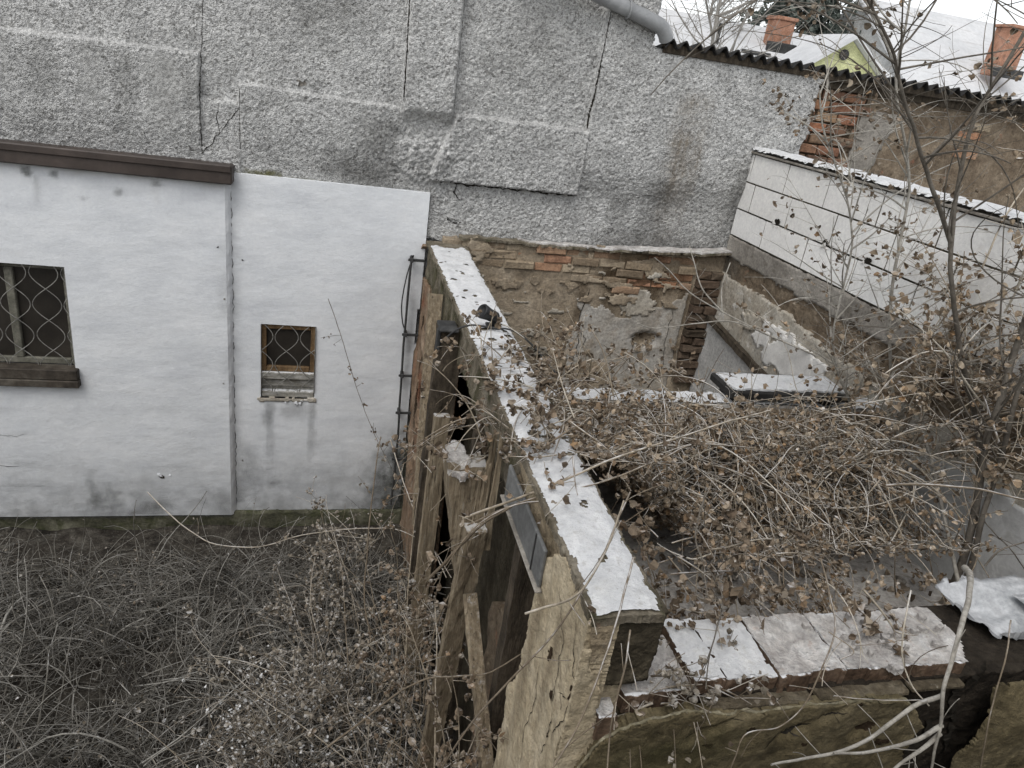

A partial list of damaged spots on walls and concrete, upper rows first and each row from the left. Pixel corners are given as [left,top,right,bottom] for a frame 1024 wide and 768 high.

crack [199,1,241,153]
crack [436,179,576,200]
crack [587,13,611,128]
spalling [795,78,873,168]
spalling [462,236,700,391]
spalling [566,402,885,460]
spalling [724,257,1024,476]
crack [520,623,576,761]